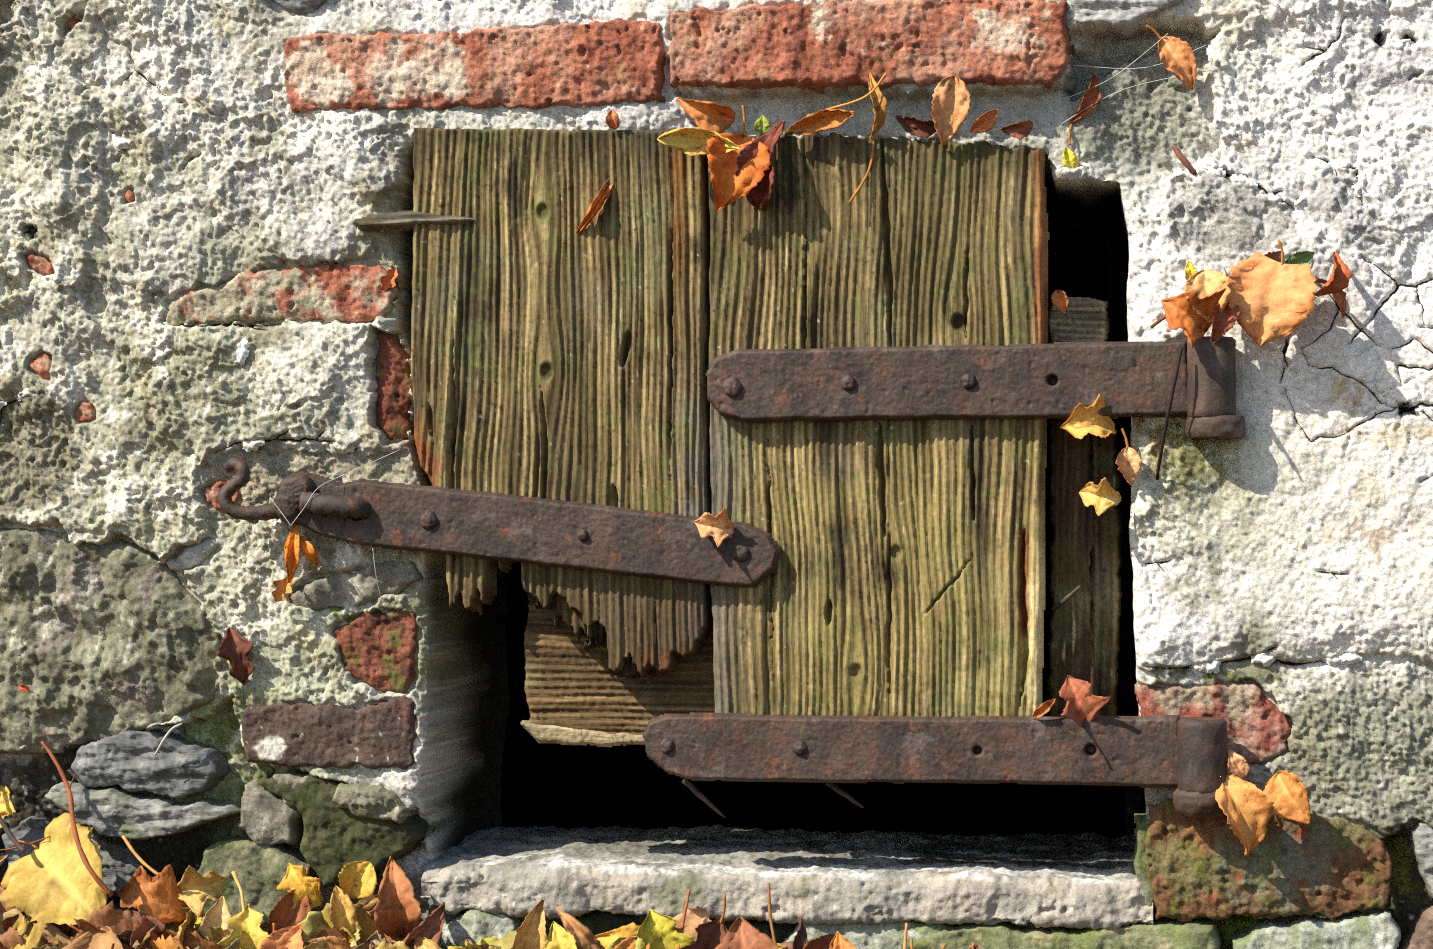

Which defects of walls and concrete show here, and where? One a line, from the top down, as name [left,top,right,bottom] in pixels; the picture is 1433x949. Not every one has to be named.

spalling [164,329,249,418]
crack [1280,256,1433,442]
crack [1146,646,1323,675]